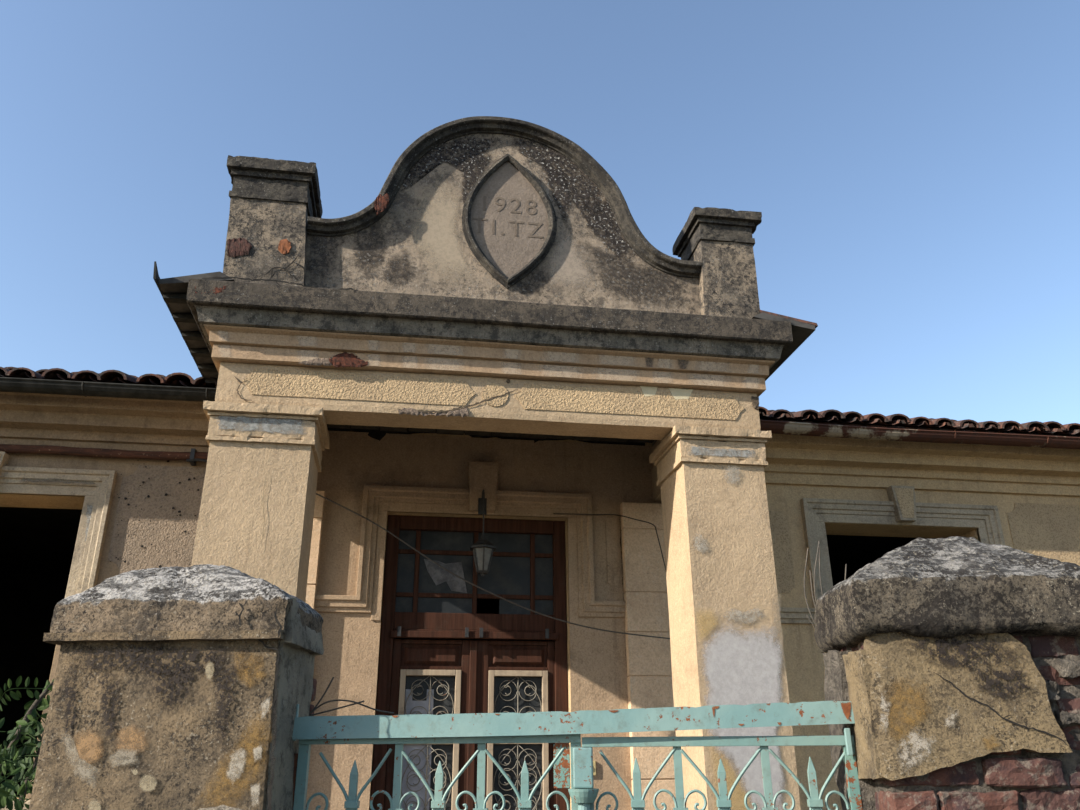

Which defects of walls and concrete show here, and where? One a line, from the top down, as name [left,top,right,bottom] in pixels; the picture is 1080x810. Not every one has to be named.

spalling [374,193,389,215]
spalling [227,237,252,257]
crack [399,390,515,413]
peeling [218,415,304,434]
peeling [691,446,755,483]
leakage [64,643,262,781]
crack [934,672,1070,747]
leakage [207,719,264,806]